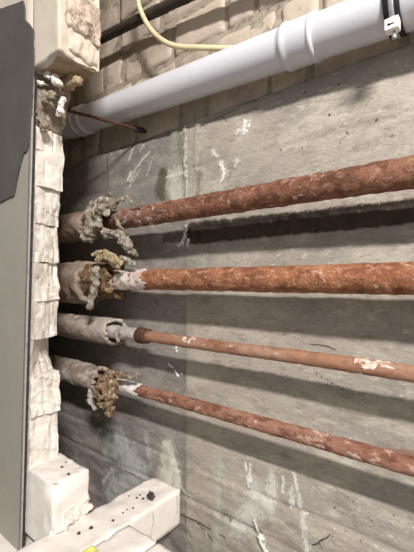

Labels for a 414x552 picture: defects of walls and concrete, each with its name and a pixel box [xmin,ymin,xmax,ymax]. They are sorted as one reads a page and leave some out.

damp [236,117,251,135]
damp [211,149,239,183]
damp [157,169,166,201]
damp [211,455,322,552]
crack [181,514,226,541]